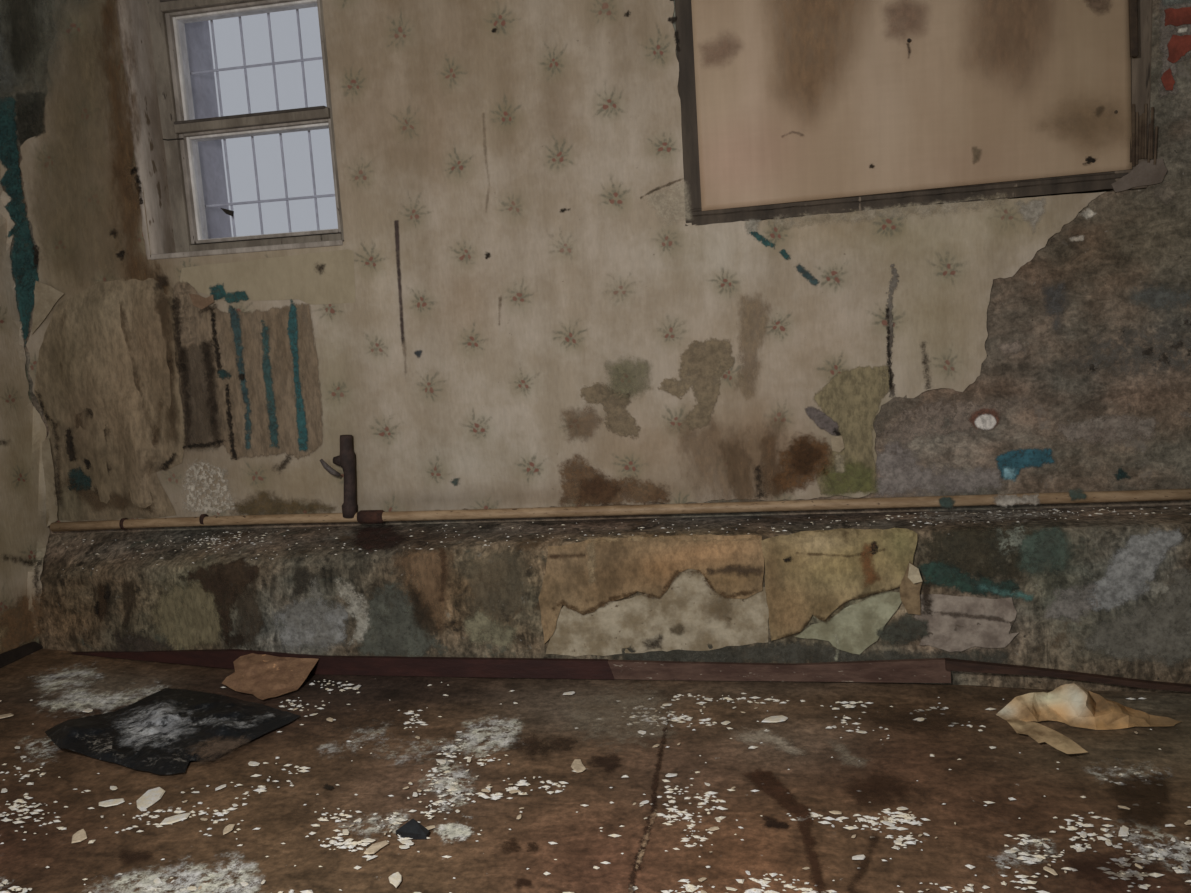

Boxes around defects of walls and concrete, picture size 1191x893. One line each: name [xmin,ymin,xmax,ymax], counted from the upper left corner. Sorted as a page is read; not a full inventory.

flaking render [1159,0,1191,98]
flaking render [746,197,1045,234]
peeling [209,283,249,303]
leakage [564,299,781,499]
flaking render [874,395,1031,496]
flaking render [1058,415,1156,446]
flaking render [914,583,1019,652]
crack [628,710,671,893]